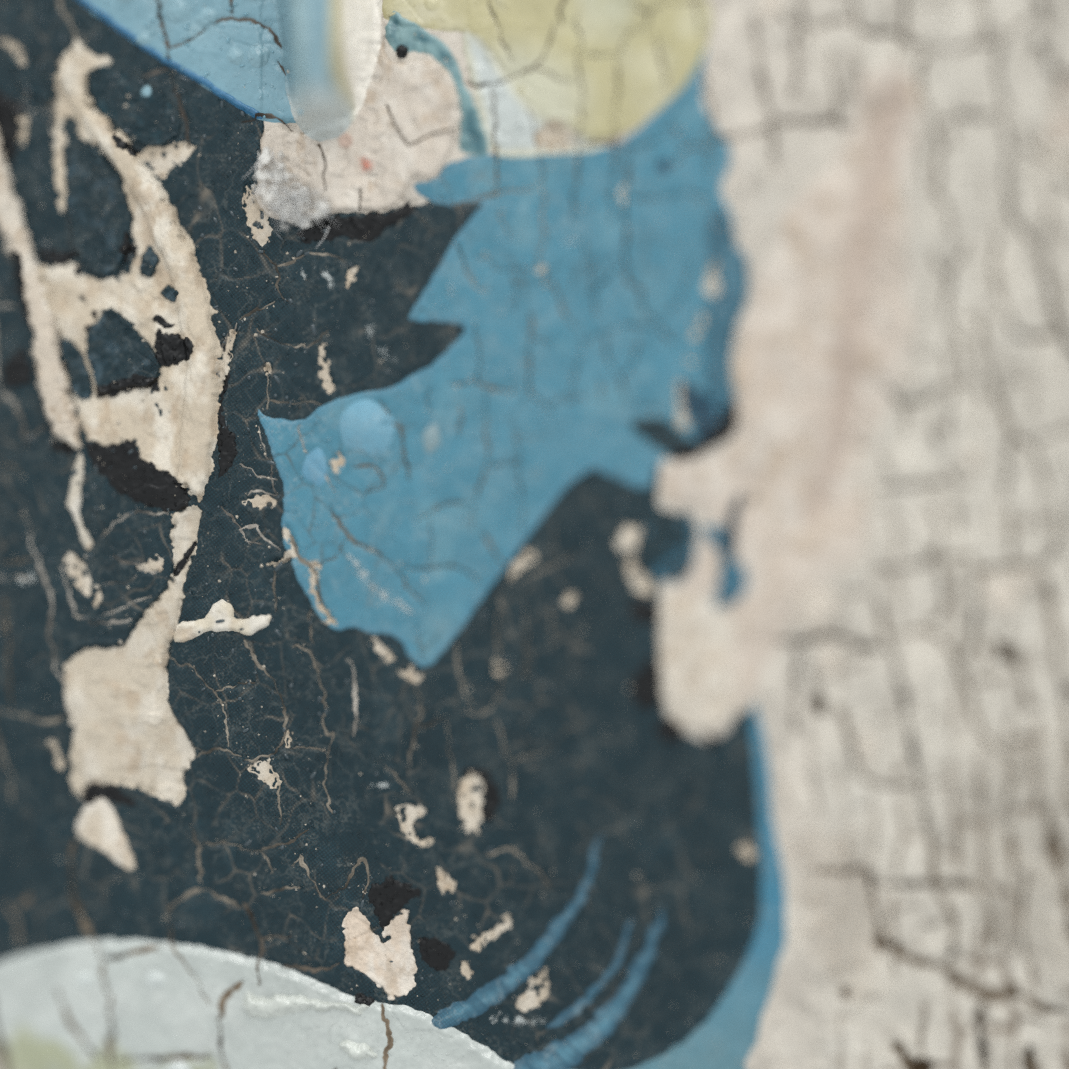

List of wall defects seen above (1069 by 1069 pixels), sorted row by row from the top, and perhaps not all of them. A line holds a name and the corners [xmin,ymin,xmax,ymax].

crack [144,0,292,149]
peeling [242,0,462,247]
crack [0,506,169,724]
peeling [0,38,271,870]
crack [169,372,480,814]
peeling [614,493,747,608]
crack [57,785,369,1069]
peeling [342,907,418,1000]
crack [381,1004,393,1069]
peeling [395,804,434,847]
peeling [516,968,549,1012]
crack [816,807,1069,1069]